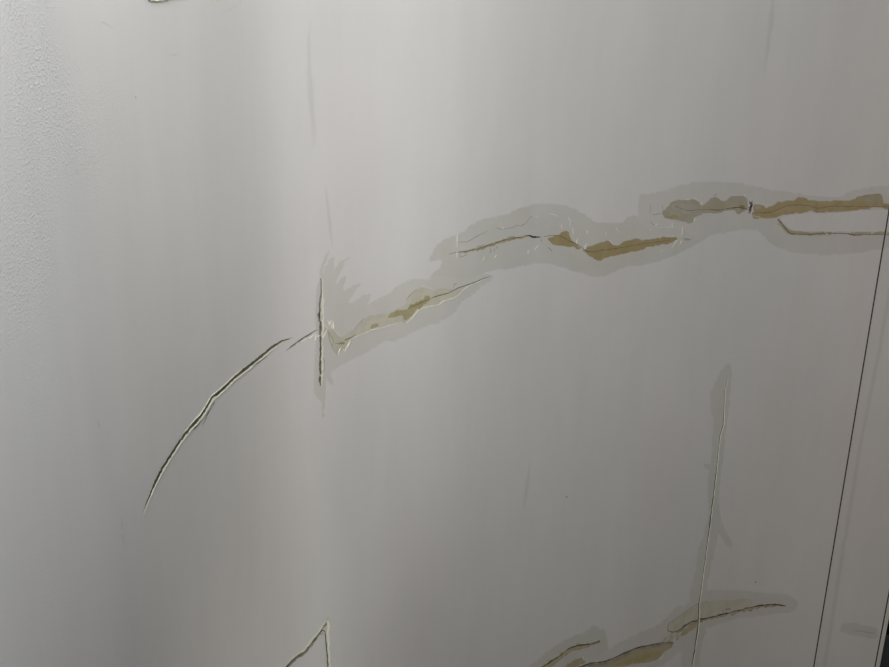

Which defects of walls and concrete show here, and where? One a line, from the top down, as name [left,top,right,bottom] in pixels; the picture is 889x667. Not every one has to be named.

crack [144,337,293,514]
crack [541,376,785,667]
crack [285,617,332,667]